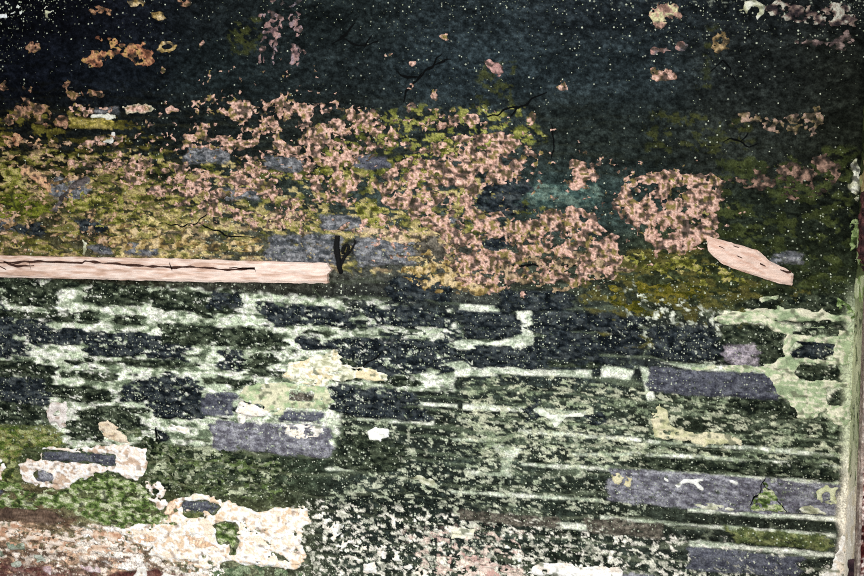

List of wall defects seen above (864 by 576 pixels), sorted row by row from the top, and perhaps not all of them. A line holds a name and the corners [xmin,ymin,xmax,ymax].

peeling [89,6,112,16]
peeling [258,0,306,77]
peeling [0,66,864,303]
peeling [46,401,68,428]
peeling [0,420,428,576]
peeling [413,475,436,486]